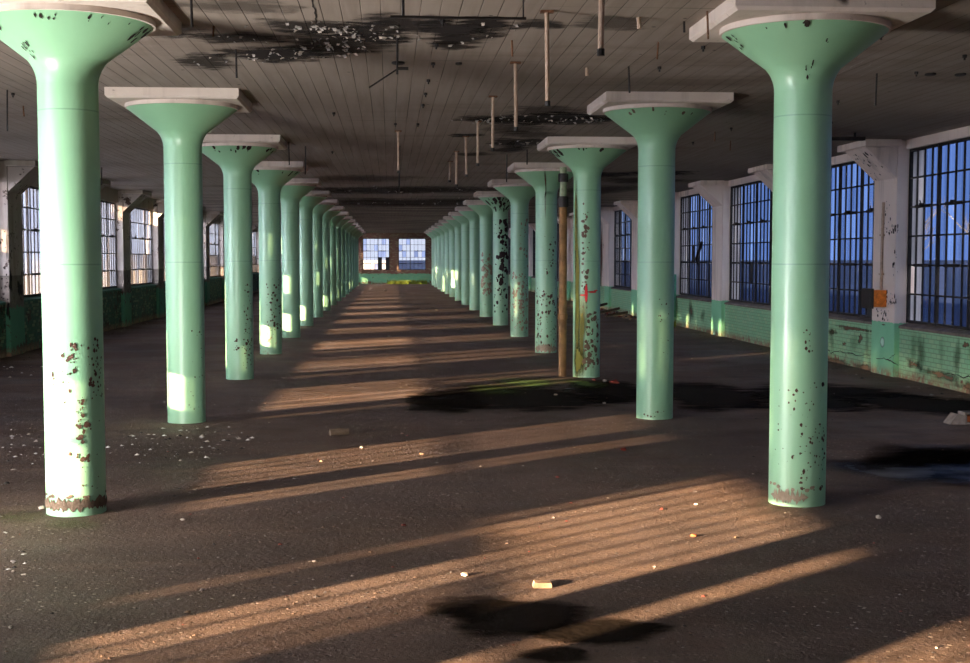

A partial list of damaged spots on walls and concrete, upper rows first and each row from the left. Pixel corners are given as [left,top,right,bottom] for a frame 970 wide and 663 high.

peeling [481,197,557,353]
peeling [581,203,599,370]
peeling [52,337,102,468]
damp [673,383,770,412]
peeling [770,423,825,505]
damp [827,383,970,415]